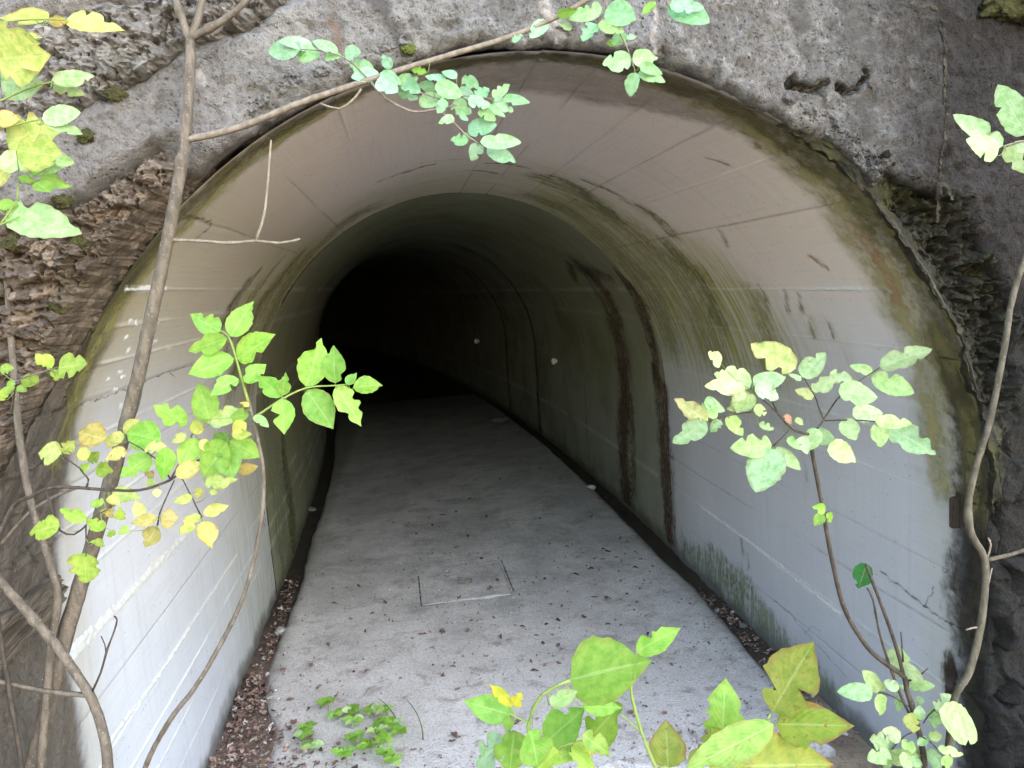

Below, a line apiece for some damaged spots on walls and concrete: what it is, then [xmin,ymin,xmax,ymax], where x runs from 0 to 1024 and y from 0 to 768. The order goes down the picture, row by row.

water stain [51,232,162,469]
spalling [0,151,218,478]
water stain [177,85,375,233]
water stain [397,53,990,768]
spalling [769,88,1024,513]